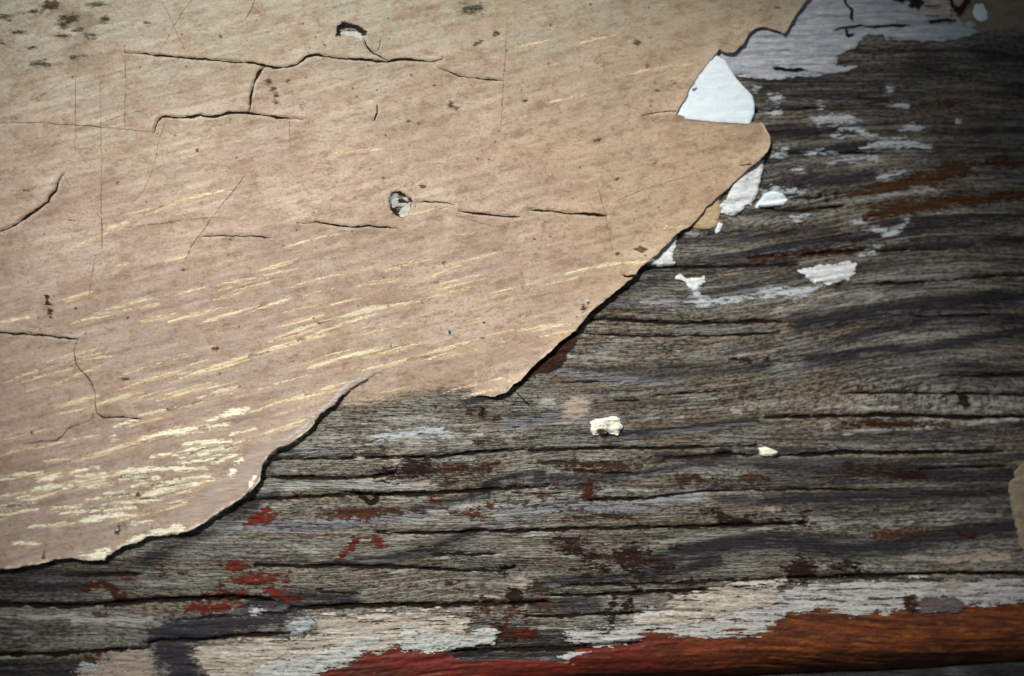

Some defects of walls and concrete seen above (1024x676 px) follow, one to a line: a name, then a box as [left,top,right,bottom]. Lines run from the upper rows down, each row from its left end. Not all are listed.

peeling [896,0,987,28]
crack [2,40,502,133]
crack [417,201,605,218]
peeling [0,0,933,569]
crack [586,317,789,338]
crack [767,373,1024,420]
crack [251,445,1006,506]
peeling [917,463,1024,614]
peeling [183,557,297,616]
crack [0,523,1024,658]
peeling [286,616,318,634]
peeling [70,647,159,676]